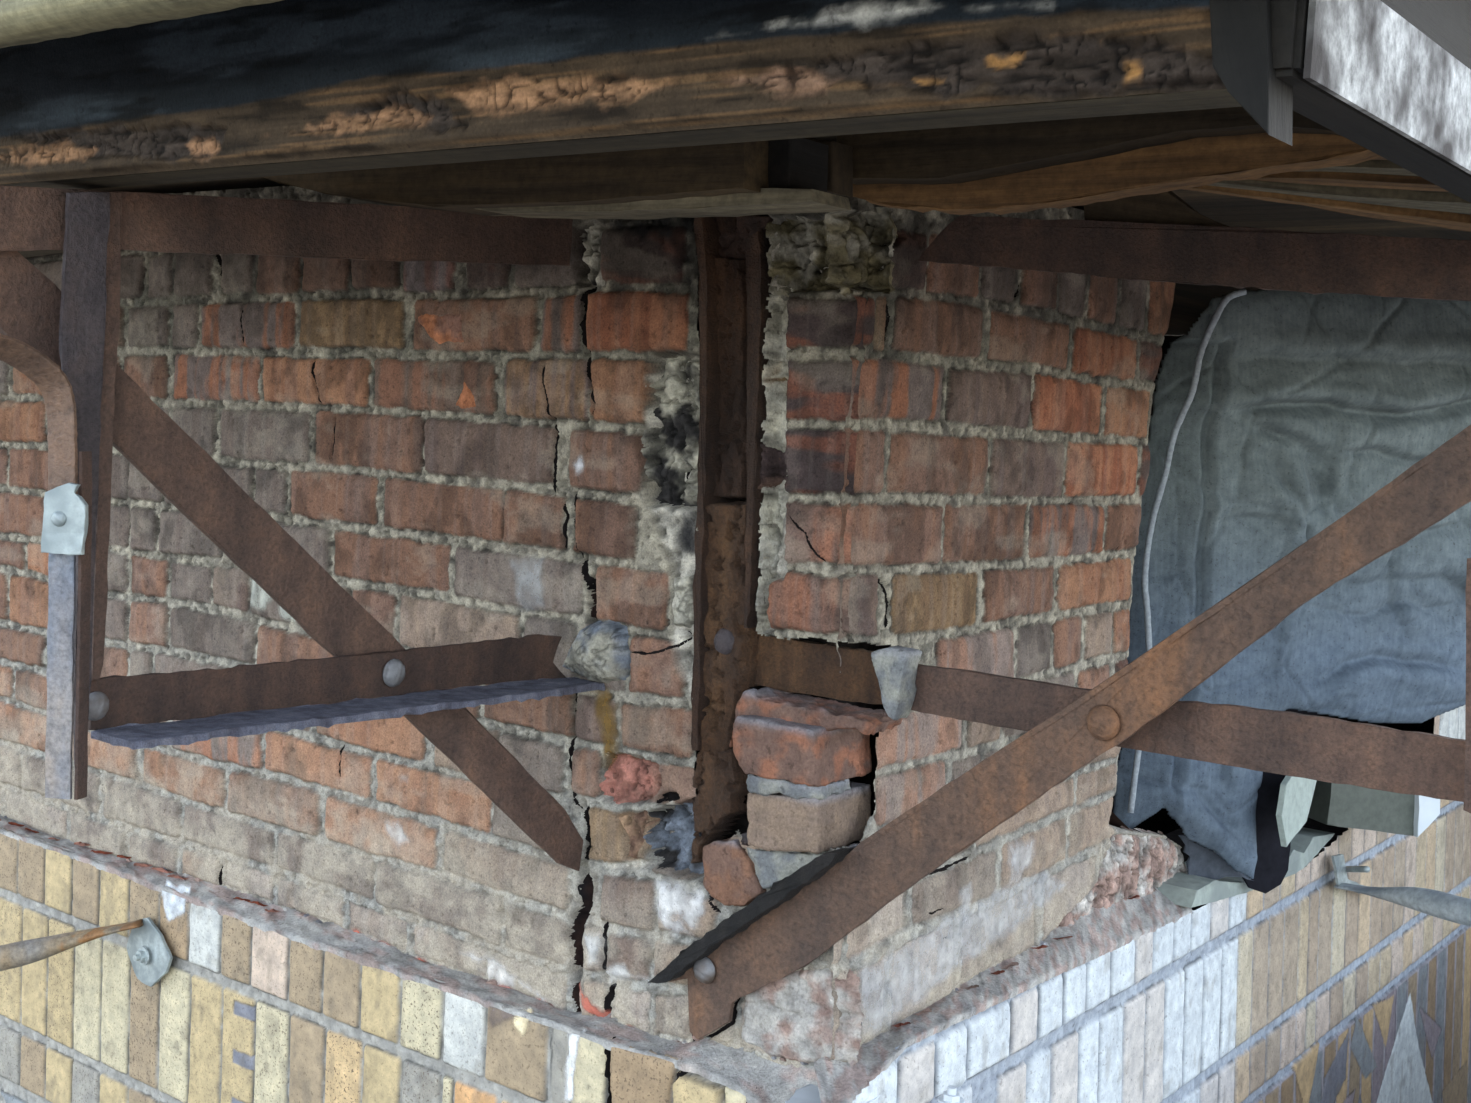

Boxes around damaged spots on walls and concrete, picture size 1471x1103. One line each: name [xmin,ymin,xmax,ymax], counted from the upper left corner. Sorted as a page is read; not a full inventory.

crack [579,287,597,415]
crack [542,367,597,619]
spalling [599,754,858,906]
spalling [1030,826,1187,949]
spalling [741,968,864,1065]
peeling [891,1008,933,1027]
peeling [965,962,1019,990]